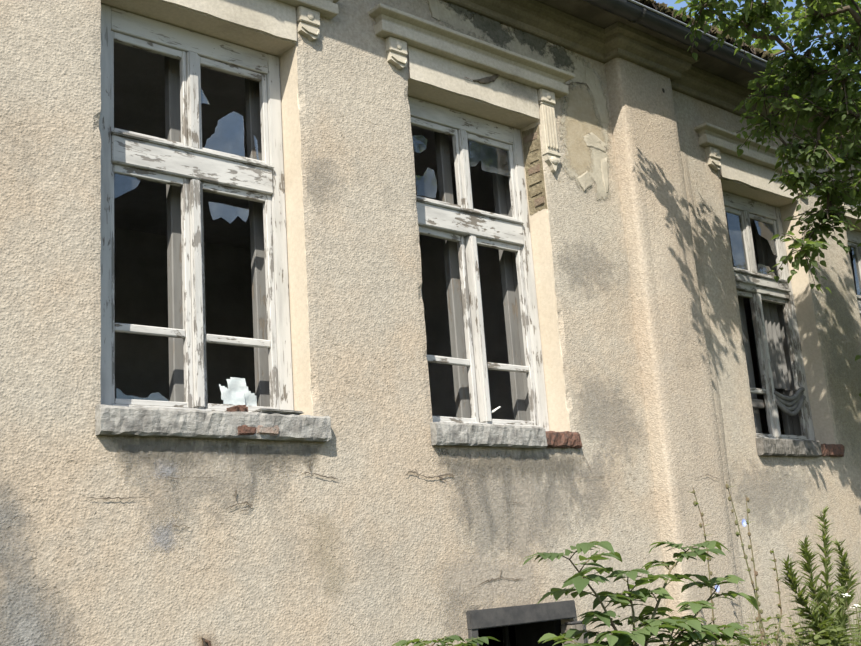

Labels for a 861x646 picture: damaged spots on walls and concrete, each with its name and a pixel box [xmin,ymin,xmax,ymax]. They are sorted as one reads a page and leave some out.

flaking render [427,0,610,199]
damp [115,436,317,474]
crack [406,468,454,483]
damp [442,453,574,477]
crack [226,489,253,511]
crack [475,569,520,588]